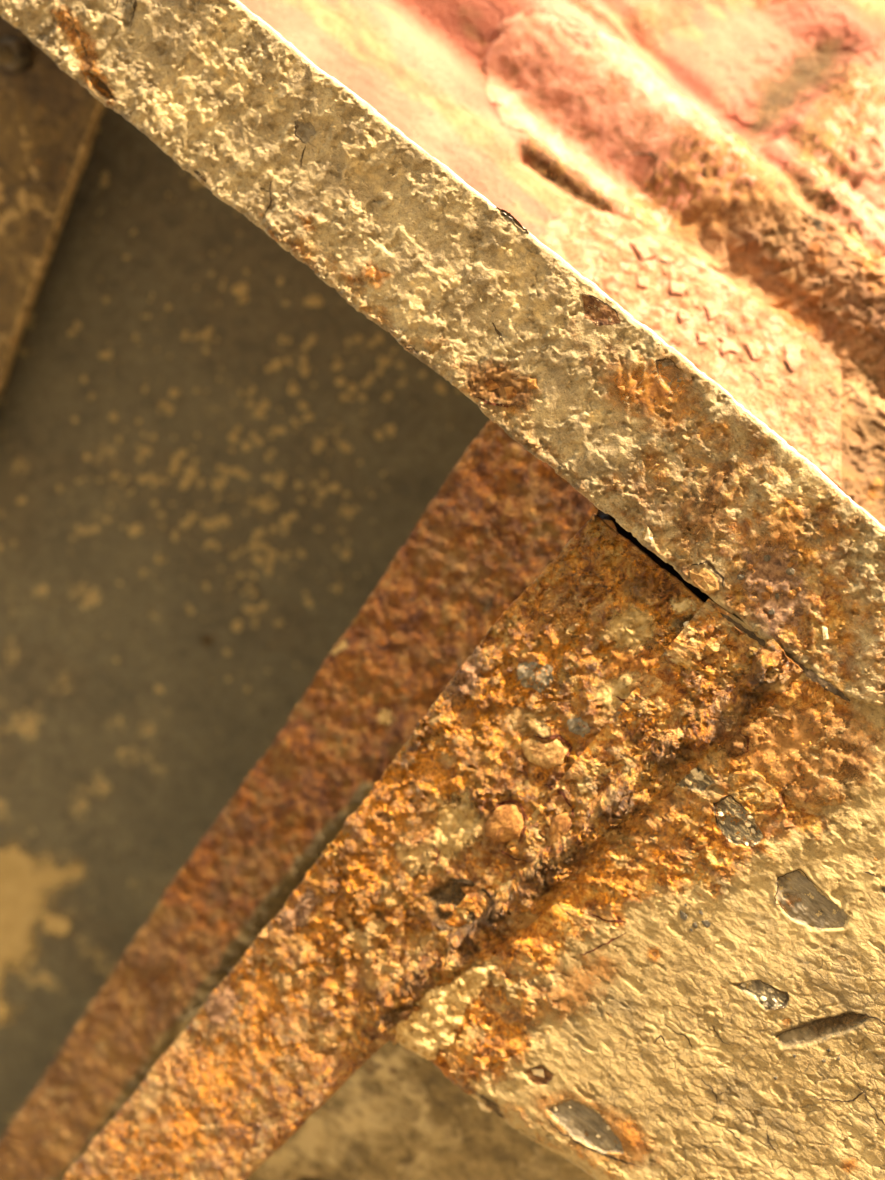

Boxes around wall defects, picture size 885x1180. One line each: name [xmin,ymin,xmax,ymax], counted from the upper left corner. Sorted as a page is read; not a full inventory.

rust [52,9,116,105]
rust [467,359,540,408]
rust [607,361,693,424]
rust [678,461,732,538]
rust [609,645,663,701]
crack [720,613,850,702]
rust [724,703,882,803]
rust [0,420,619,1180]
rust [842,1160,858,1171]